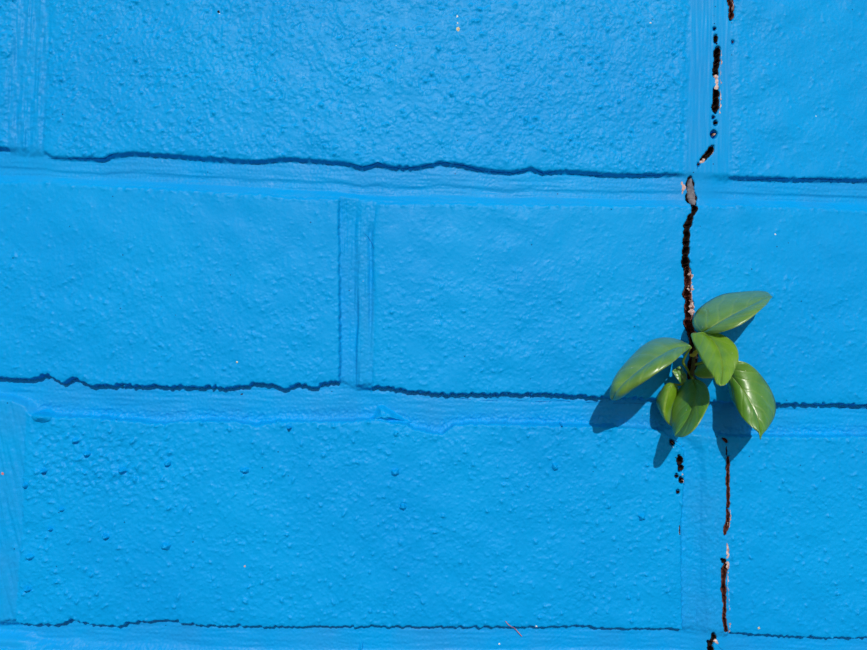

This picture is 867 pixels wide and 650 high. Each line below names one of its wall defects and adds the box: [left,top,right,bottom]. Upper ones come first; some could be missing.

crack [349,162,602,177]
crack [627,0,734,379]
crack [742,175,842,183]
crack [669,440,684,493]
crack [707,436,731,650]